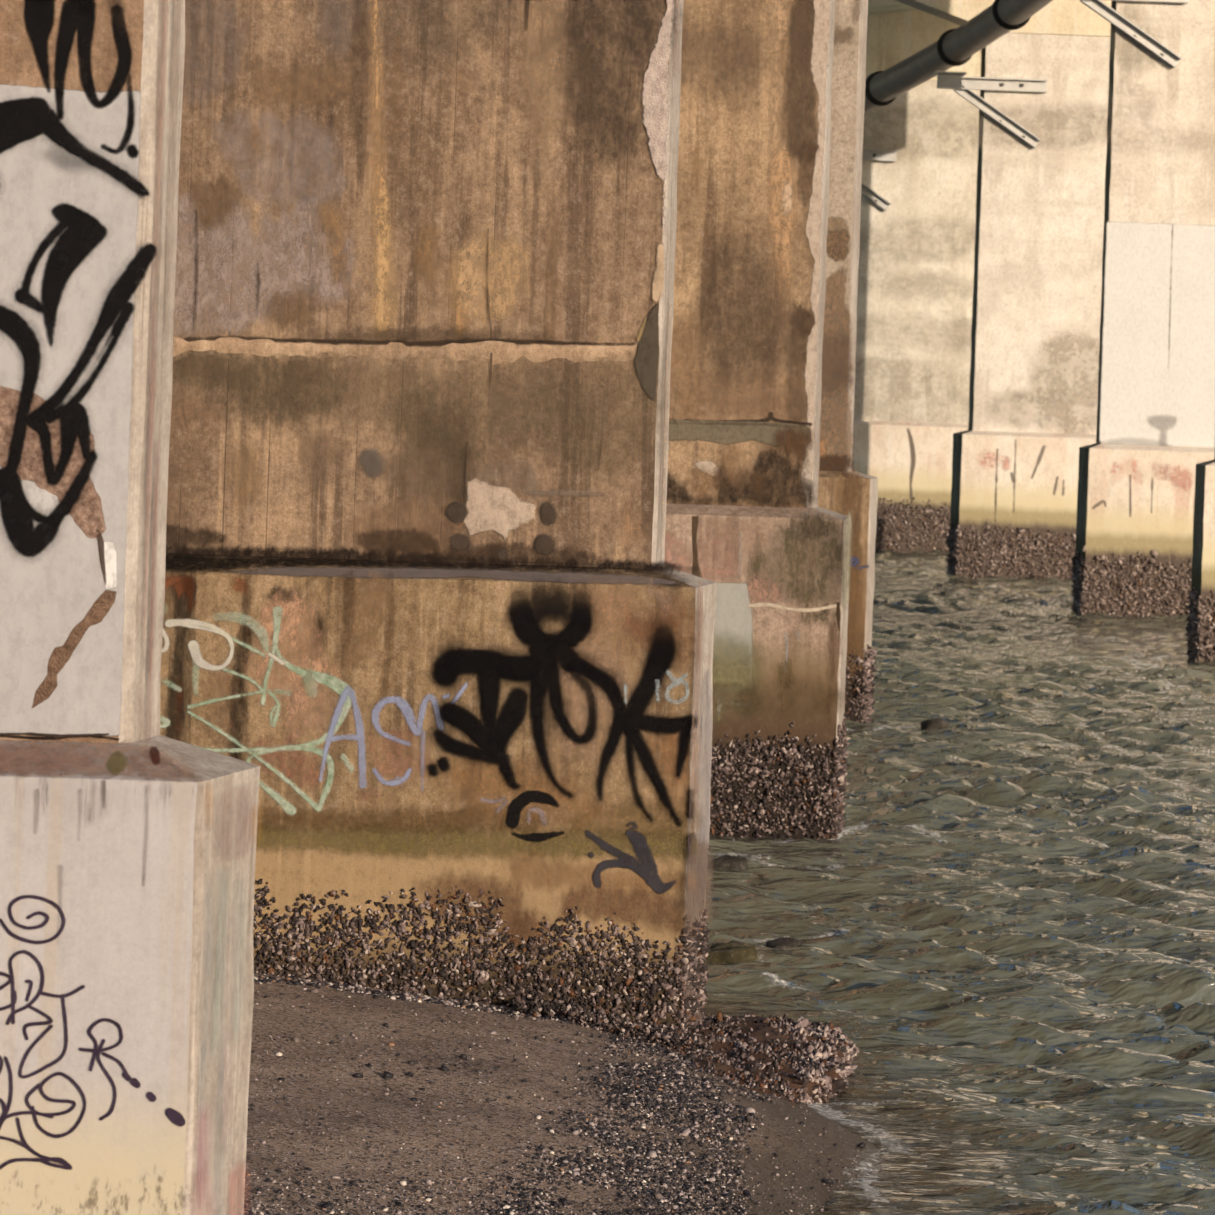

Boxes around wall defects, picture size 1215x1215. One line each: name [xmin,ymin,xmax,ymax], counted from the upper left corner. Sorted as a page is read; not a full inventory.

crack [523,0,531,28]
peeling [642,0,674,226]
crack [181,213,635,382]
peeling [652,242,665,302]
damp [667,0,864,721]
peeling [801,0,854,508]
spalling [0,386,117,708]